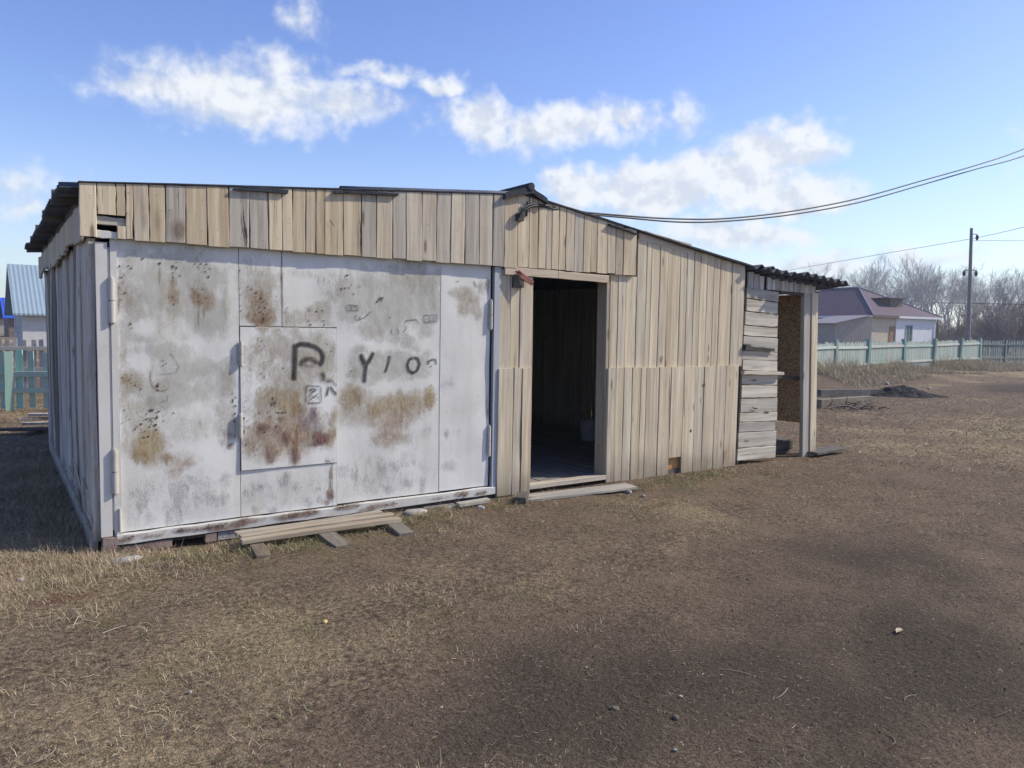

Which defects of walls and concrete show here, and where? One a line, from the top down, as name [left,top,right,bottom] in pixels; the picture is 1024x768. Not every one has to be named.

rust [133,430,172,471]
rust [251,404,333,463]
rust [341,384,434,438]
rust [276,472,397,520]
rust [177,518,258,533]